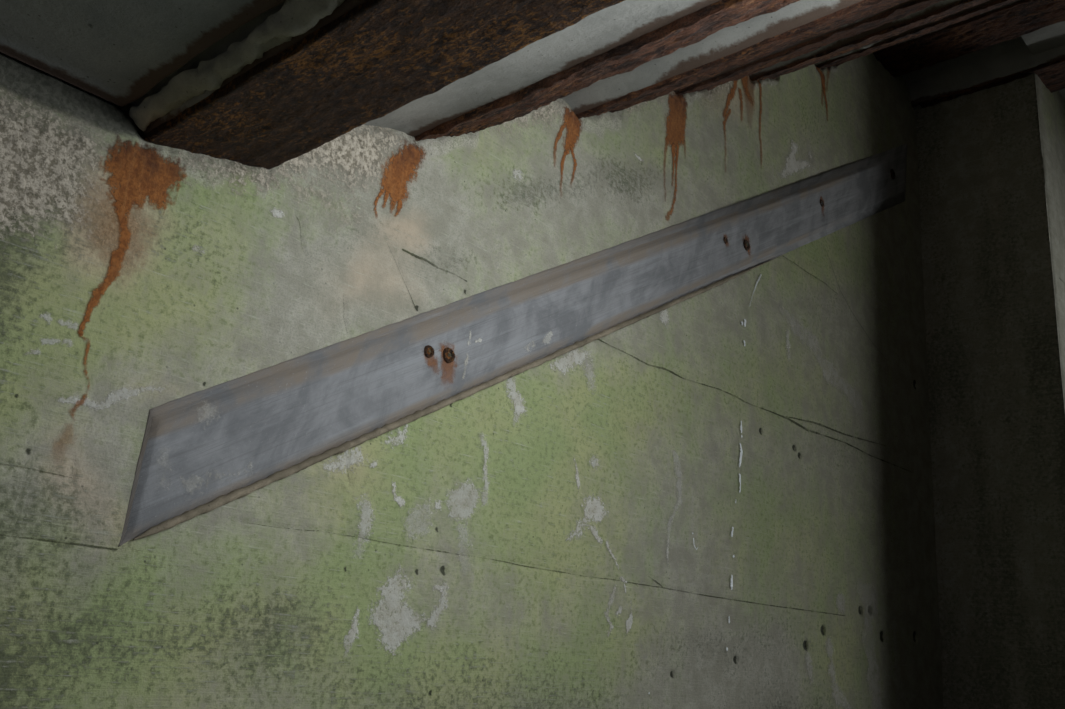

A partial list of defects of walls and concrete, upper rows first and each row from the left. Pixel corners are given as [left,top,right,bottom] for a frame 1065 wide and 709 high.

rust [374,141,426,216]
rust [553,108,581,185]
rust [664,93,688,220]
rust [723,75,762,164]
rust [72,136,186,416]
crack [631,355,906,470]
crack [0,534,118,550]
peeling [435,436,489,520]
peeling [567,496,608,540]
peeling [344,566,449,655]
crack [492,559,845,616]